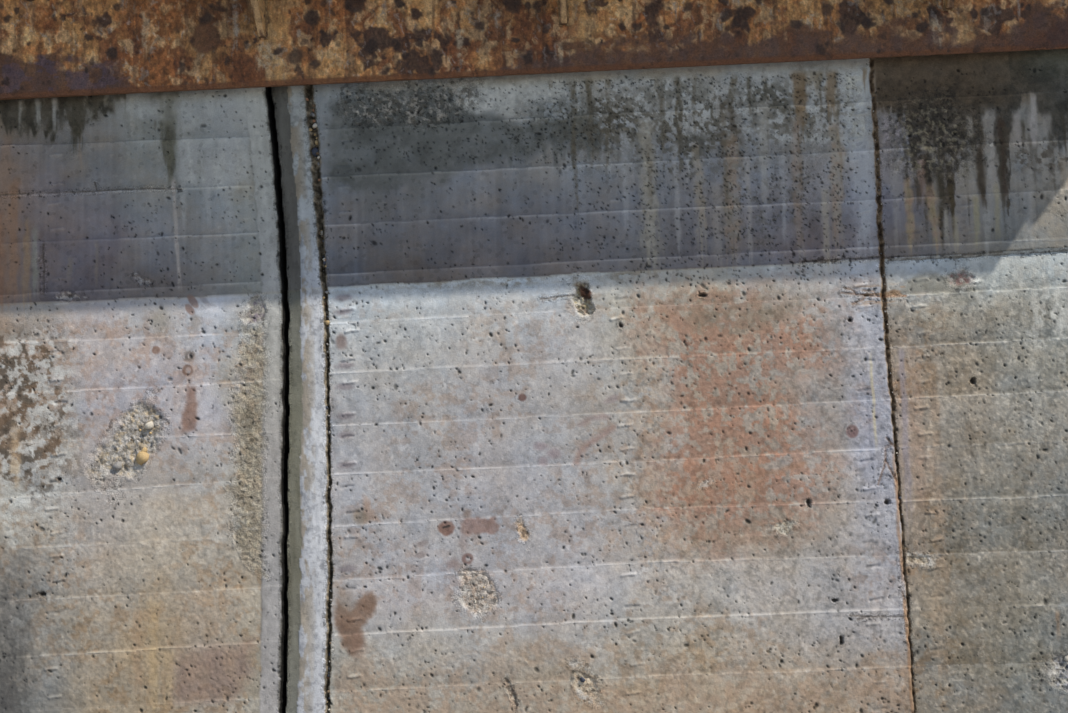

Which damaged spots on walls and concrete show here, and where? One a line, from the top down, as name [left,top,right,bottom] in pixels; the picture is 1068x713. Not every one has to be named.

rust [341,0,370,17]
water stain [319,62,808,238]
peeling [0,320,173,540]
water stain [0,88,262,437]
spalling [450,565,502,624]
spalling [565,268,598,324]
rust [330,616,914,713]
water stain [843,307,902,549]
rust [893,343,957,713]
crack [797,58,1068,713]
water stain [898,90,1068,480]
spalling [1034,648,1068,695]